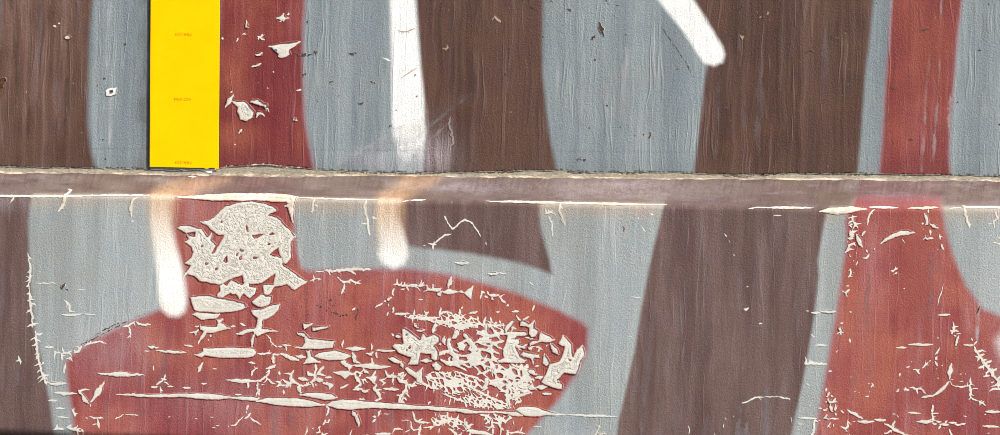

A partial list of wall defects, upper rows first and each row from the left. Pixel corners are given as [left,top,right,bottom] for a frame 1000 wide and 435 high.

peeling [236,20,318,68]
peeling [225,91,269,145]
peeling [839,213,944,297]
peeling [144,192,441,427]
peeling [375,276,586,396]
peeling [938,313,973,349]
peeling [48,381,77,418]
peeling [818,388,886,428]
peeling [895,337,966,429]